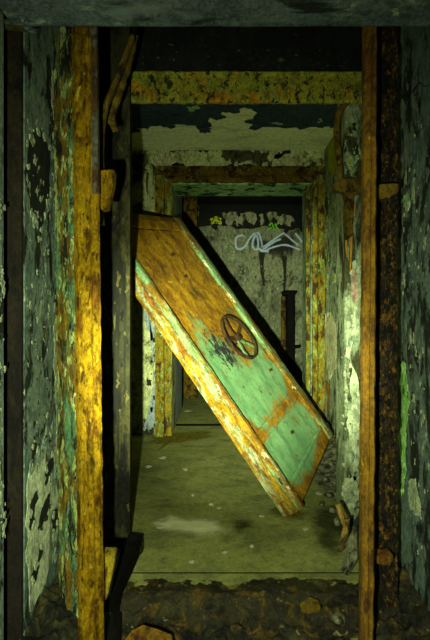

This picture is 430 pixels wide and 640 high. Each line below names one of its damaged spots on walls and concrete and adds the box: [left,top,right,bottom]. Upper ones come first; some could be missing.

peeling [132,108,333,166]
peeling [197,204,302,260]
water stain [259,236,294,291]
peeling [401,165,430,317]
peeling [24,119,59,612]
peeling [398,328,430,526]